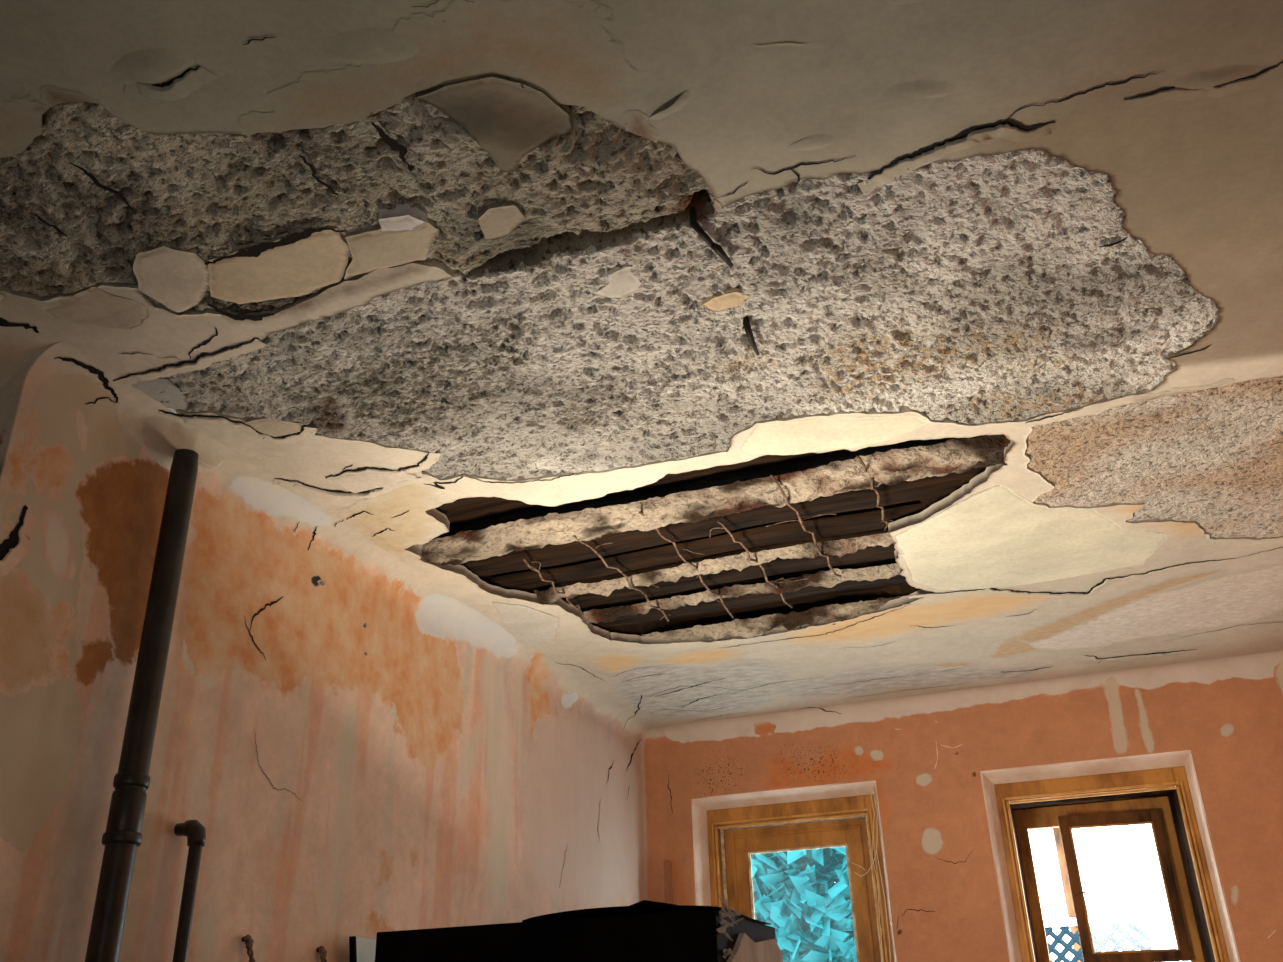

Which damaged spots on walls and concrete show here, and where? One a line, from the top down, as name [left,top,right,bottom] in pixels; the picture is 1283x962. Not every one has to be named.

crack [717,62,1283,198]
crack [0,303,274,404]
spalling [0,74,1283,651]
crack [155,410,317,444]
crack [0,505,37,577]
damp [20,442,170,667]
damp [335,473,441,563]
crack [272,453,585,550]
crack [243,596,284,660]
crack [555,547,1282,846]
damp [1103,676,1155,755]
damp [182,749,211,827]